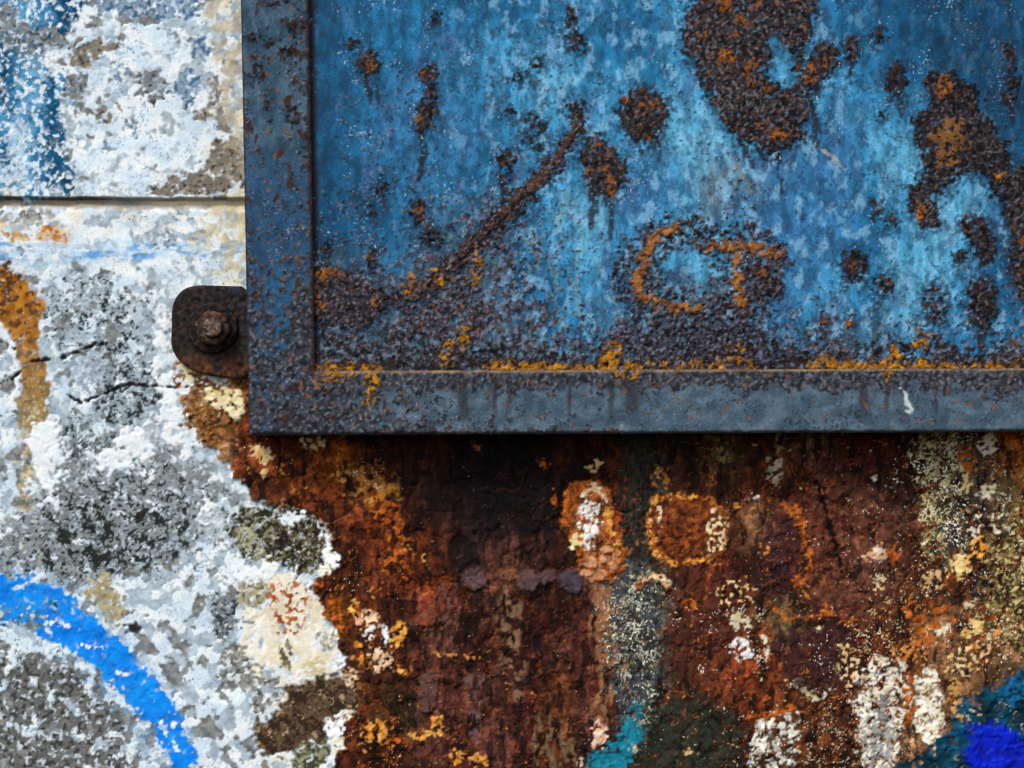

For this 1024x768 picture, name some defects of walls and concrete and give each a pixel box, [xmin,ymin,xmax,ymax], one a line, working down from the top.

rust [243,0,306,125]
rust [313,0,1024,371]
crack [0,338,105,388]
crack [66,376,176,406]
rust [164,348,1024,768]